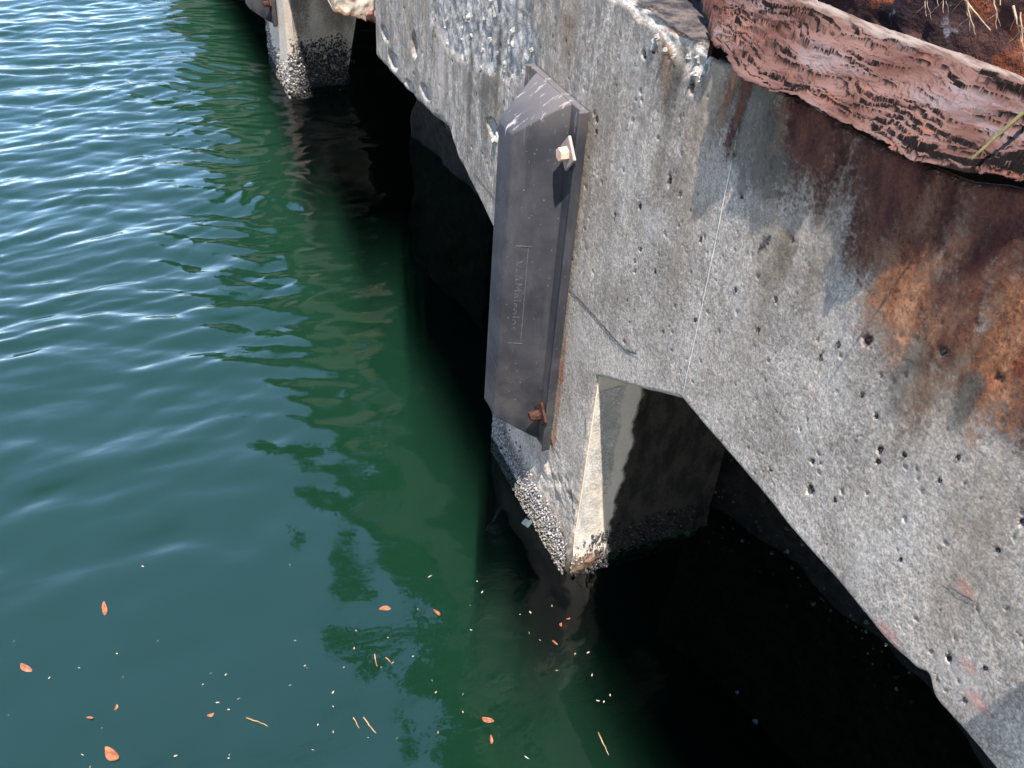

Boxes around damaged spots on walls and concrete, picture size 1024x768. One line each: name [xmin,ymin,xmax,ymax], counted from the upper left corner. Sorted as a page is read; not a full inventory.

corrosion [767,96,1024,451]